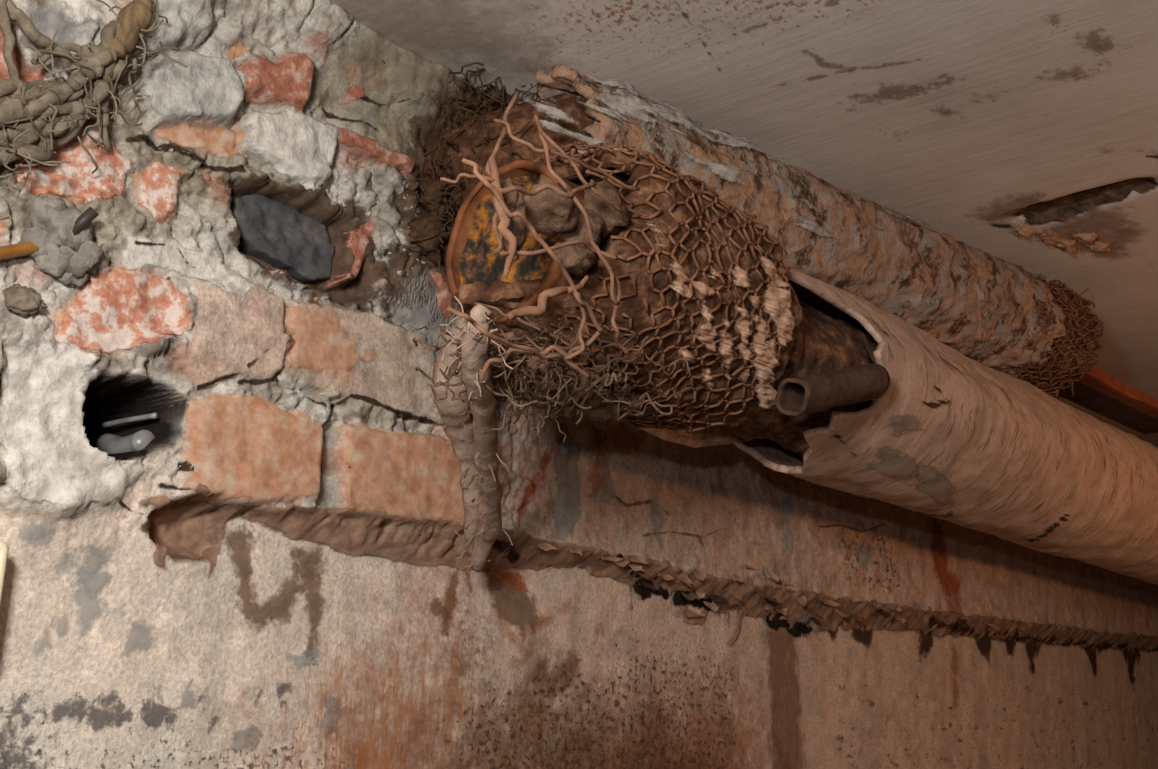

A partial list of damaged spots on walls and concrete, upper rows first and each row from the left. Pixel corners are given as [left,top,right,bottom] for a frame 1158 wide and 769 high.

spalling [15,129,180,221]
spalling [977,177,1158,258]
spalling [54,172,462,382]
spalling [82,382,158,460]
crack [196,349,284,390]
crack [308,394,443,431]
spalling [140,393,465,569]
rust [931,522,959,612]
damp [0,691,366,769]
damp [277,683,291,704]
damp [431,609,743,769]
damp [768,626,802,769]